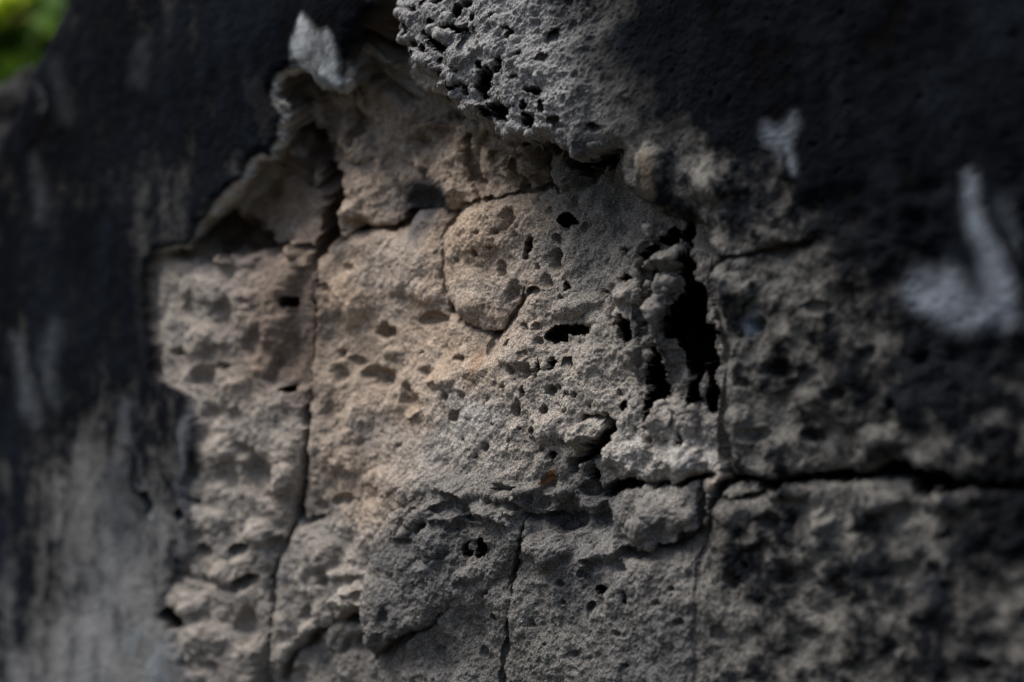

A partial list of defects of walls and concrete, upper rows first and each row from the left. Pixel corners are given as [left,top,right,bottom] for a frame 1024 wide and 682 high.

crack [131,76,557,386]
spalling [144,1,732,682]
crack [296,506,327,527]
crack [280,607,361,682]
crack [497,510,573,682]
crack [566,413,1024,682]